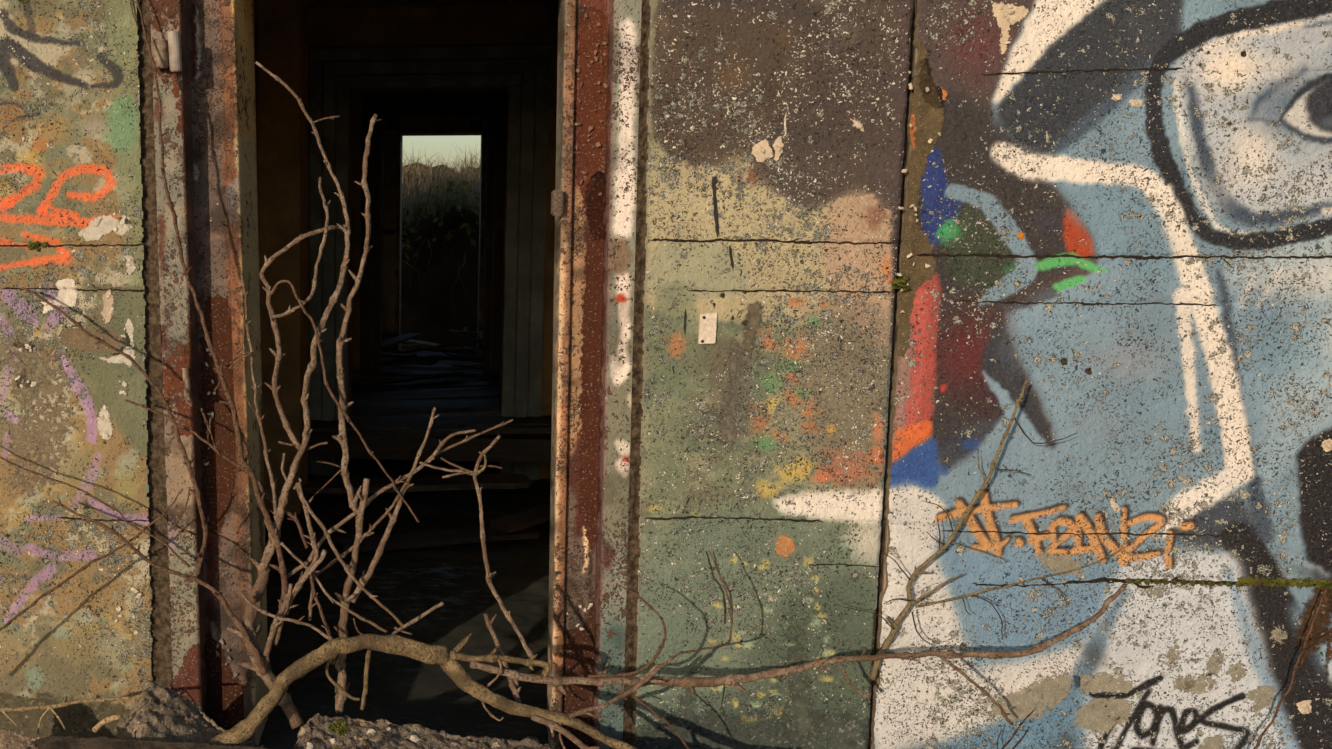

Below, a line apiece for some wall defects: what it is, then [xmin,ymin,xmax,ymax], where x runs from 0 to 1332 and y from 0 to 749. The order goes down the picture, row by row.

rust [150,0,185,154]
rust [574,7,613,549]
rust [162,295,236,539]
rust [172,632,244,730]
rust [562,603,599,749]